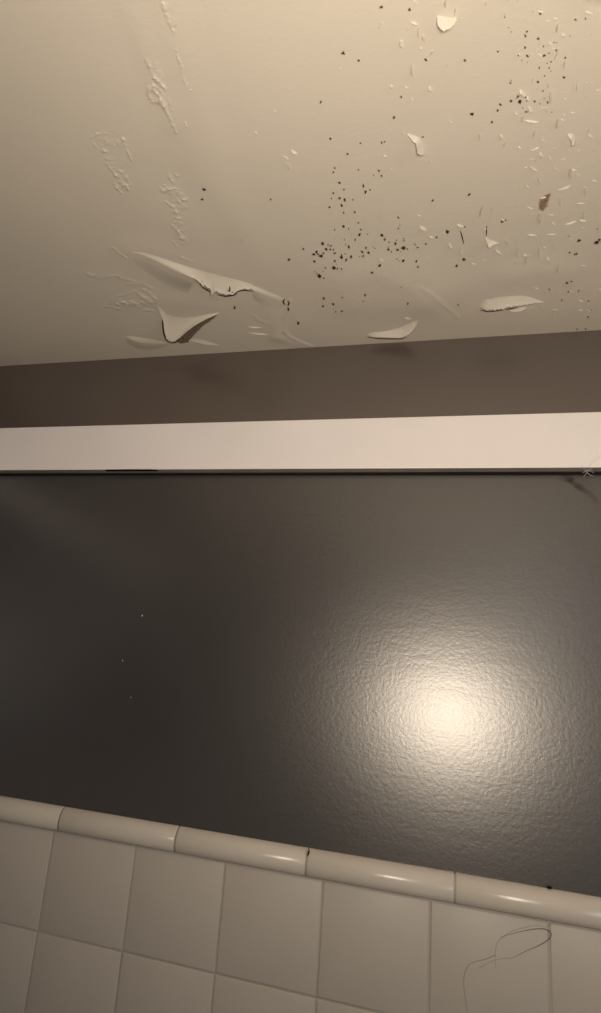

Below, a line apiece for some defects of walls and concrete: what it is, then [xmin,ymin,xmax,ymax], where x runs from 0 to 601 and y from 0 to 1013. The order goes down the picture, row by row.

peeling [437,0,462,31]
leakage [491,31,566,123]
peeling [479,77,597,273]
leakage [302,167,370,279]
peeling [131,251,288,309]
peeling [479,279,571,314]
peeling [125,305,220,350]
peeling [367,317,418,339]